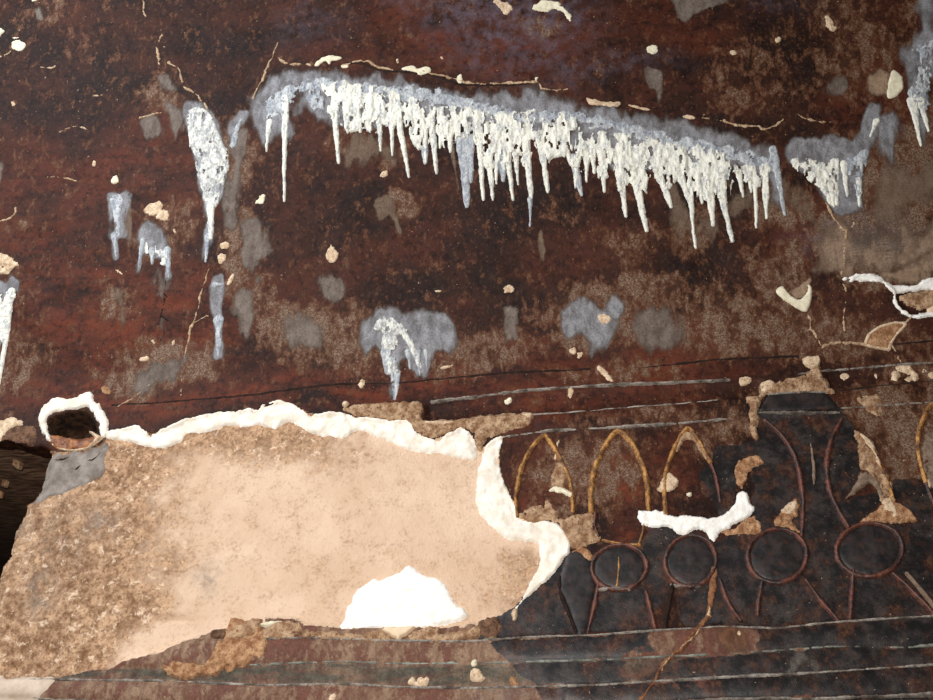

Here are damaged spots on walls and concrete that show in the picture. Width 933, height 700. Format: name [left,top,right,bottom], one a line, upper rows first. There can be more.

crack [252,43,650,111]
crack [683,114,825,131]
leakage [140,0,933,360]
leakage [107,190,172,296]
flaking render [776,220,933,319]
leakage [0,275,20,383]
leakage [359,306,458,400]
flaking render [0,397,541,682]
flaking render [506,462,601,561]
flaking render [657,473,679,492]
flaking render [408,676,429,686]
crack [639,566,718,700]